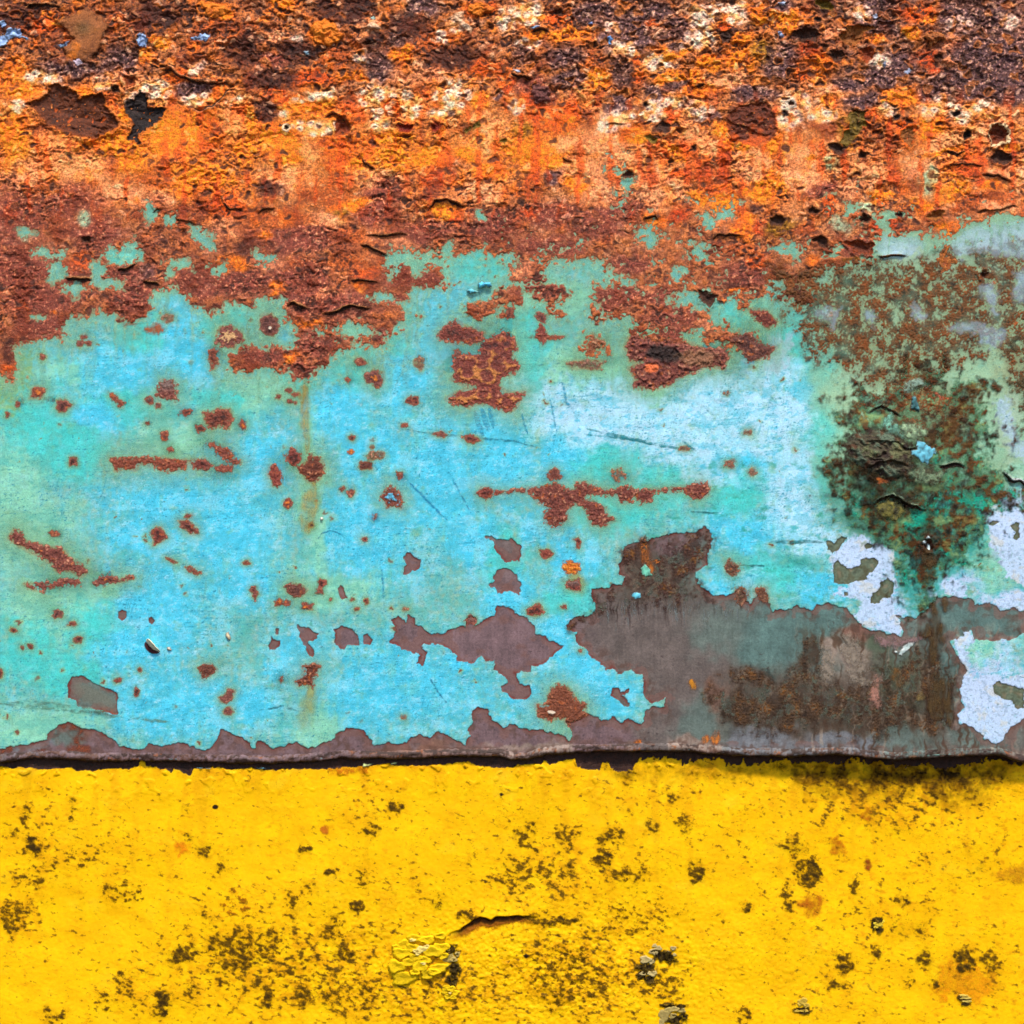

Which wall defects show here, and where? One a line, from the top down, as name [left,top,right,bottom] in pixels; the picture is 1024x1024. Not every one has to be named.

corrosion [0,0,1024,448]
corrosion [108,379,247,474]
corrosion [5,528,137,596]
corrosion [476,467,710,528]
peeling [989,521,1020,540]
peeling [0,526,1024,769]
corrosion [0,637,1024,776]
crack [458,915,529,936]